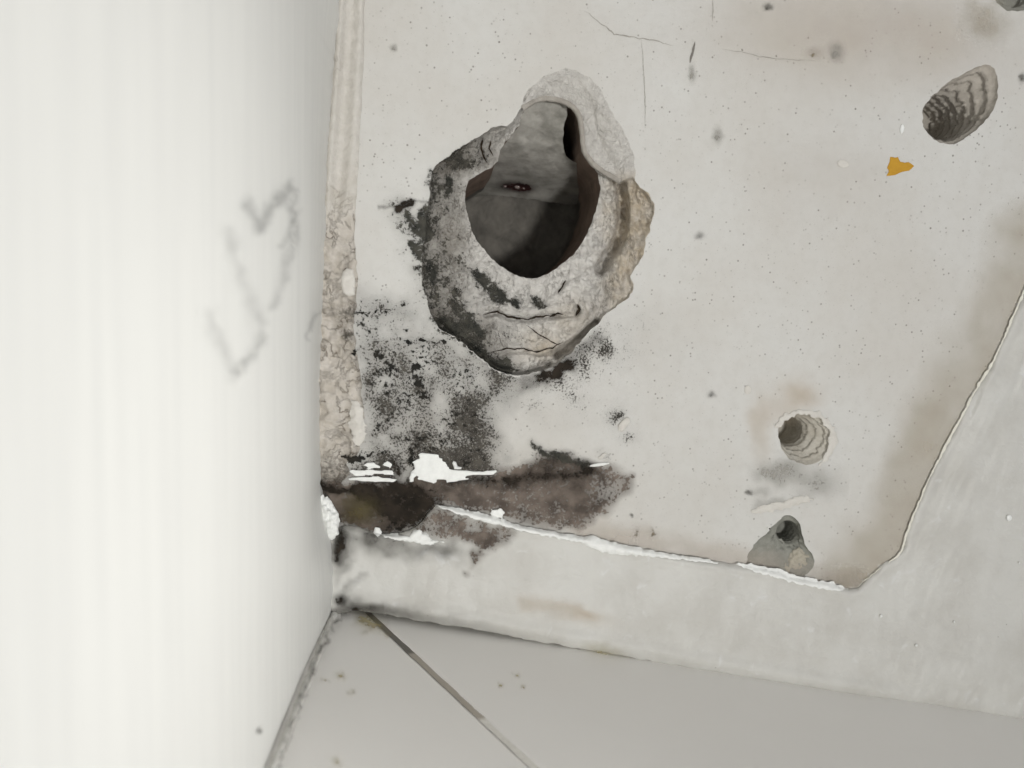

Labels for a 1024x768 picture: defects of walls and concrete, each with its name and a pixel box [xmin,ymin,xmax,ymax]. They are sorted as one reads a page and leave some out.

water stain [320,141,635,566]
spalling [421,68,655,376]
spalling [774,409,839,466]